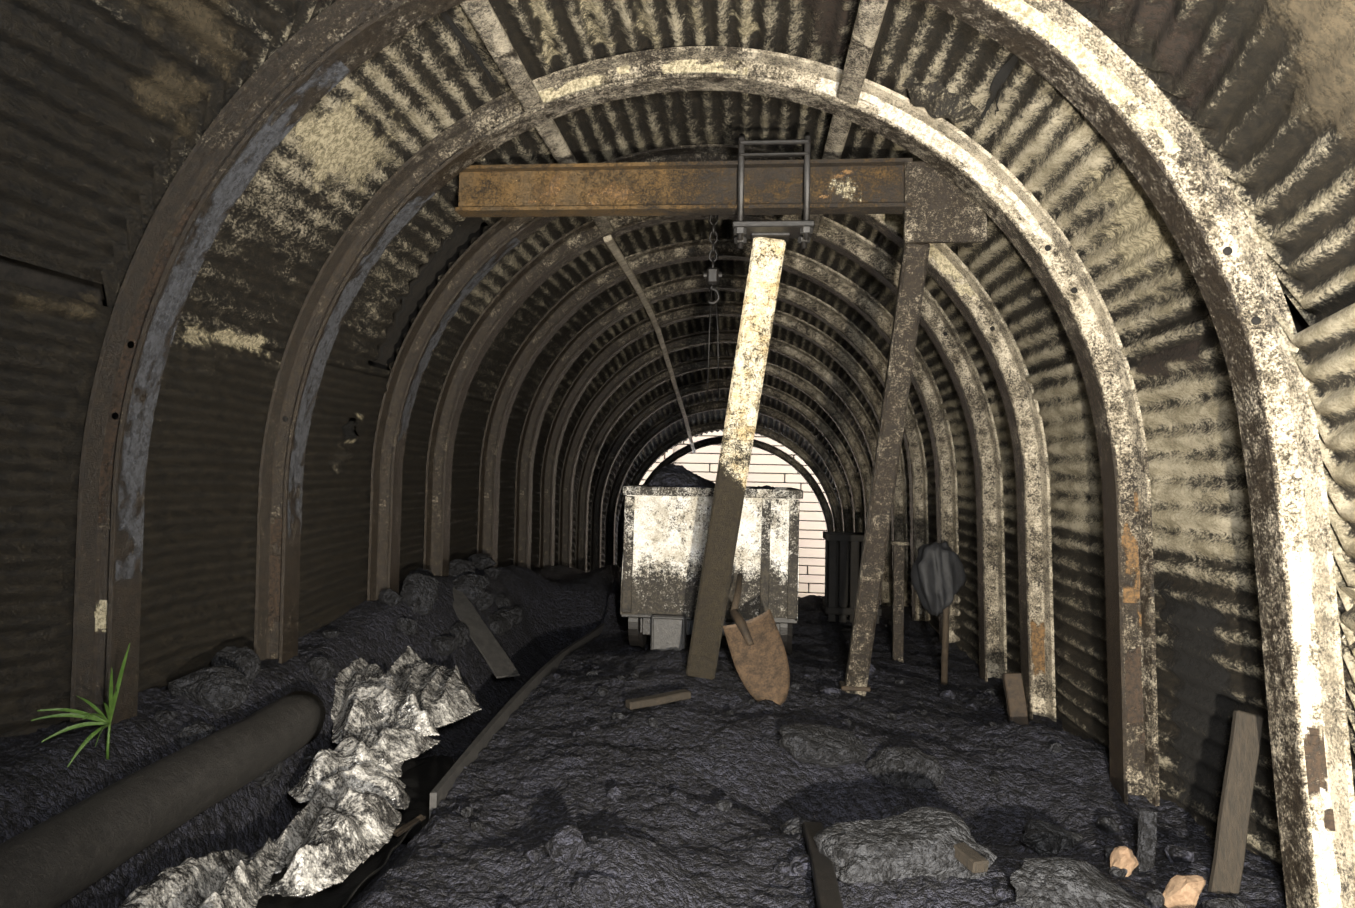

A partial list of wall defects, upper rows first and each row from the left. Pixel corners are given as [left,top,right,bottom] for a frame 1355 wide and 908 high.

rust [1121,493,1142,626]